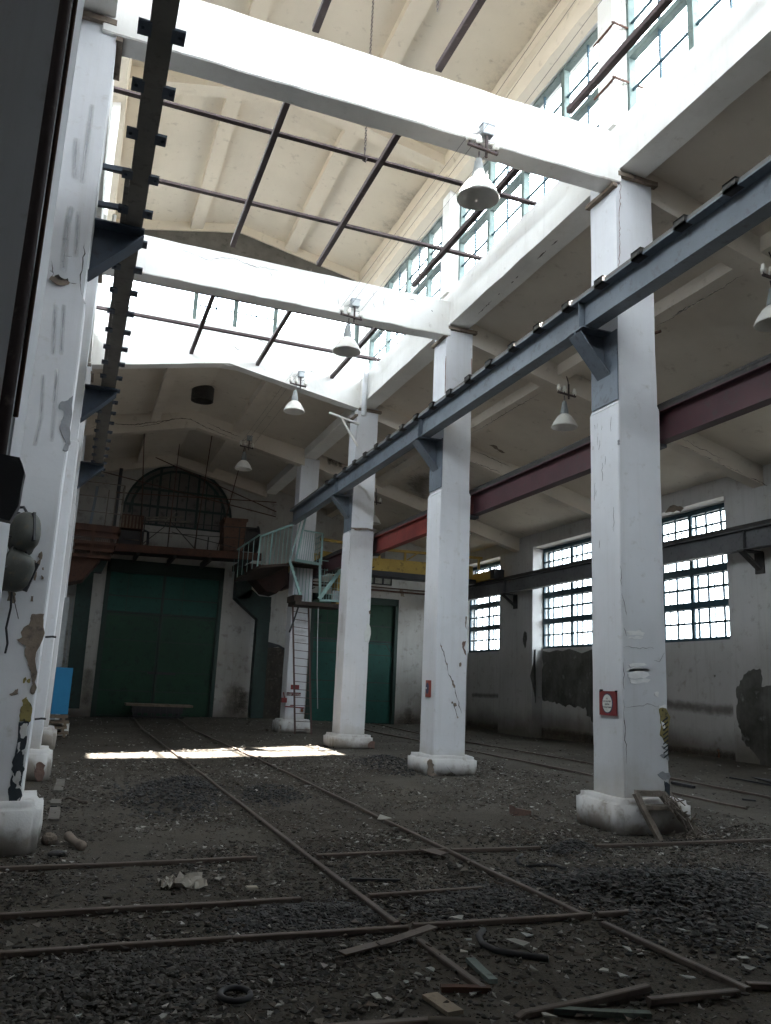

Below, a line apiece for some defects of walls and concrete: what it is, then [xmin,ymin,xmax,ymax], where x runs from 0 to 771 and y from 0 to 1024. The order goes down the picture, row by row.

spalling [49,261,76,286]
peeling [59,396,73,452]
spalling [10,614,45,696]
crack [440,644,462,718]
peeling [627,663,666,728]
spalling [736,669,771,766]